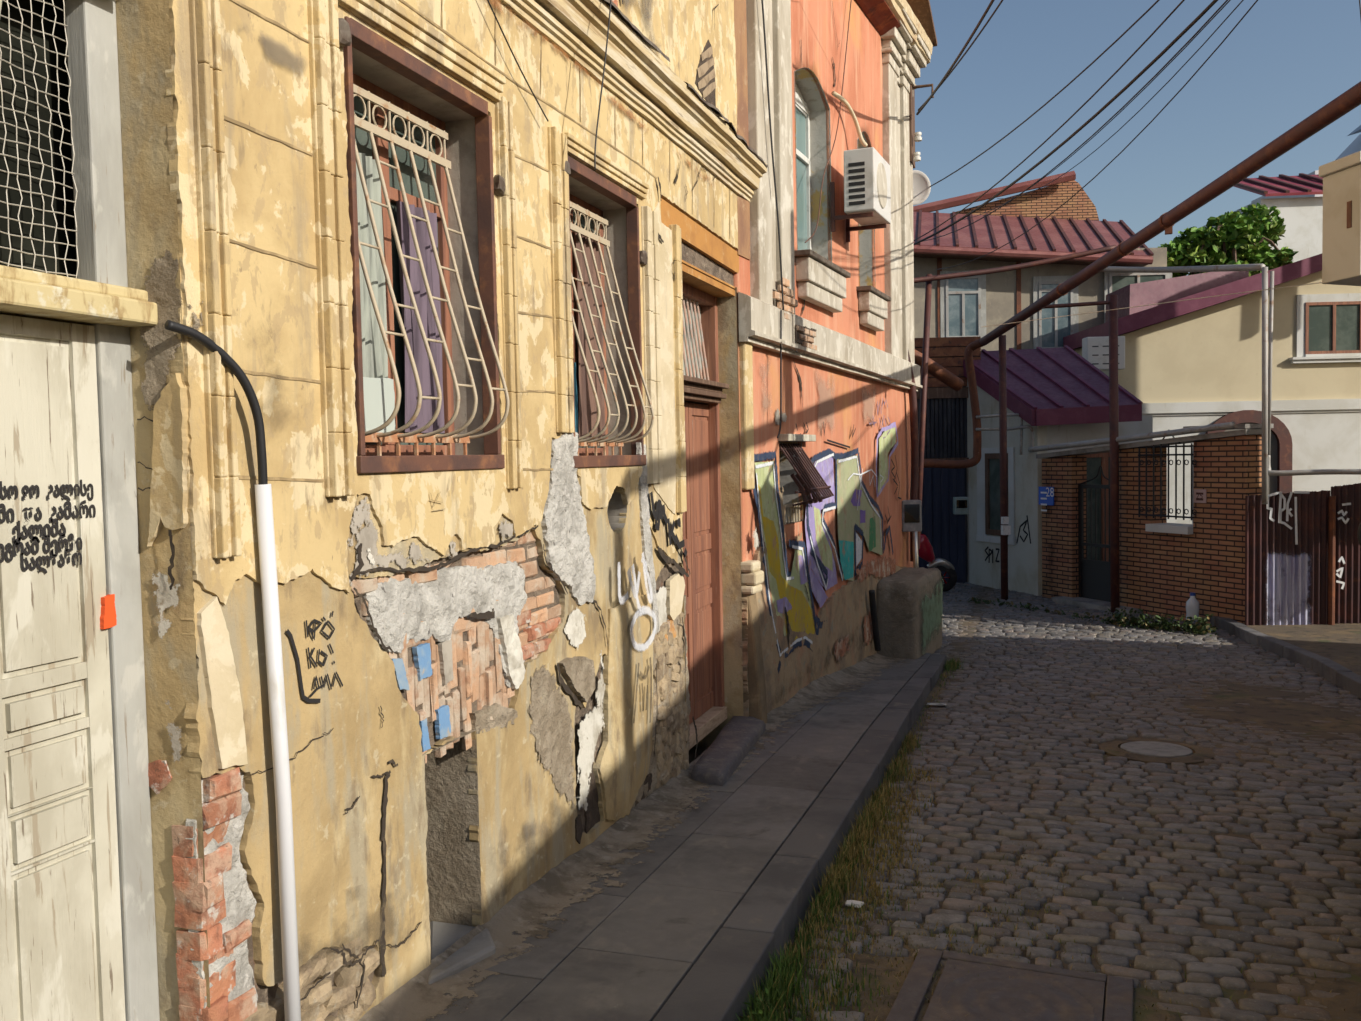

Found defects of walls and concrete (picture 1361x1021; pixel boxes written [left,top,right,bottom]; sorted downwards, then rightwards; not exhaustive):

peeling [140,249,203,547]
spalling [148,700,182,794]
peeling [152,572,181,639]
flaking render [171,596,285,1021]
crack [252,728,334,775]
flaking render [299,937,381,1021]
crack [303,759,422,1008]
flaking render [348,496,606,811]